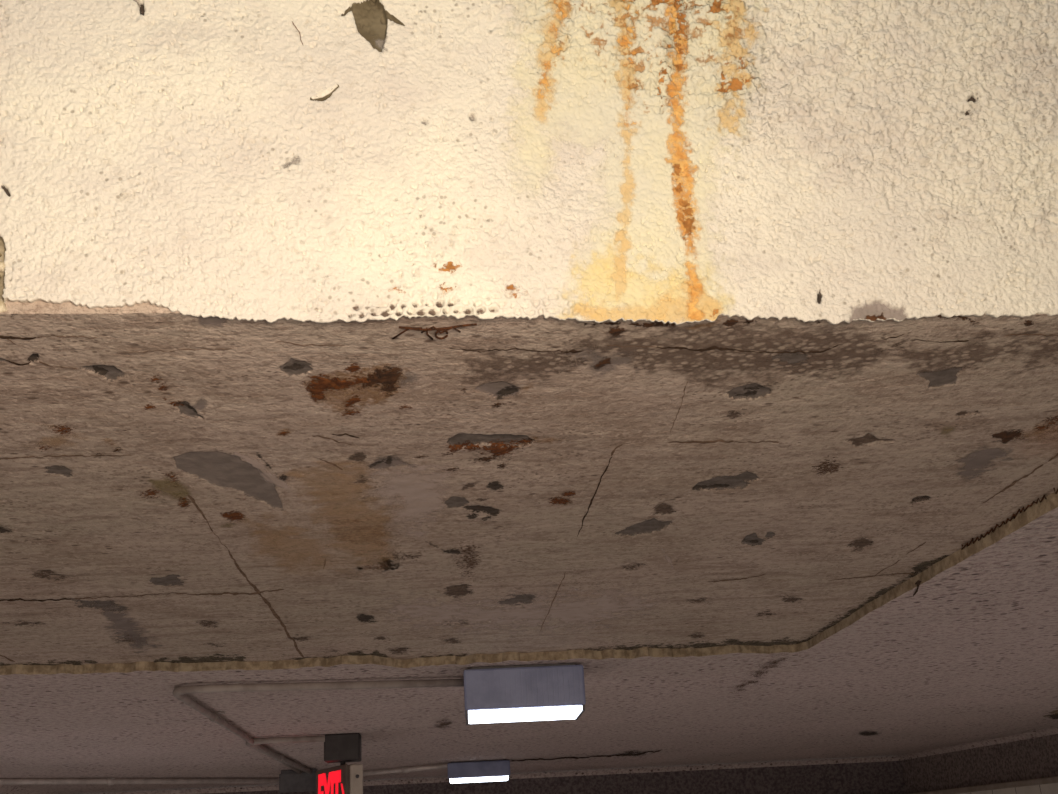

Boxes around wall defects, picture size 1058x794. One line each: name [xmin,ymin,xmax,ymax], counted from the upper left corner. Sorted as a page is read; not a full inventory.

spalling [341,0,405,52]
corrosion [513,0,758,337]
flaking render [0,237,18,315]
corrosion [301,363,416,419]
corrosion [444,433,535,468]
crack [577,444,623,537]